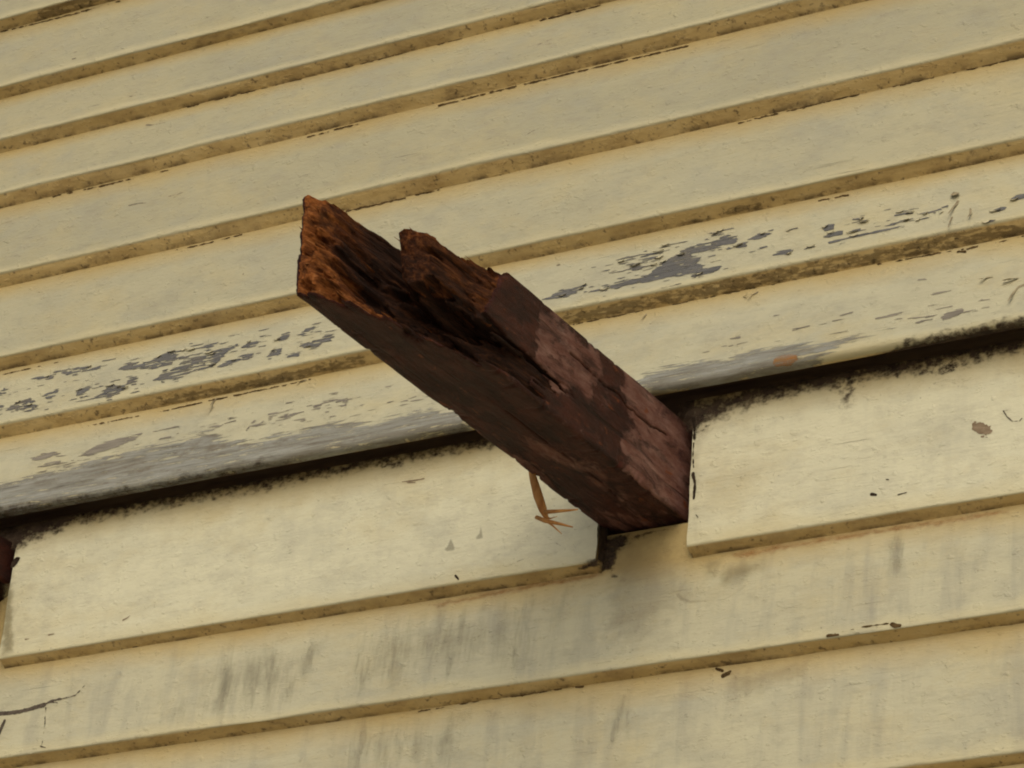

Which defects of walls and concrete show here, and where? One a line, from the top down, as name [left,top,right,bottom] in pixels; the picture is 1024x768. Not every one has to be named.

peeling [542,228,793,300]
peeling [806,192,972,249]
peeling [983,194,1024,223]
peeling [0,322,335,412]
peeling [638,290,989,391]
damp [678,339,1024,435]
peeling [0,392,471,518]
damp [0,438,494,548]
crack [0,686,84,748]